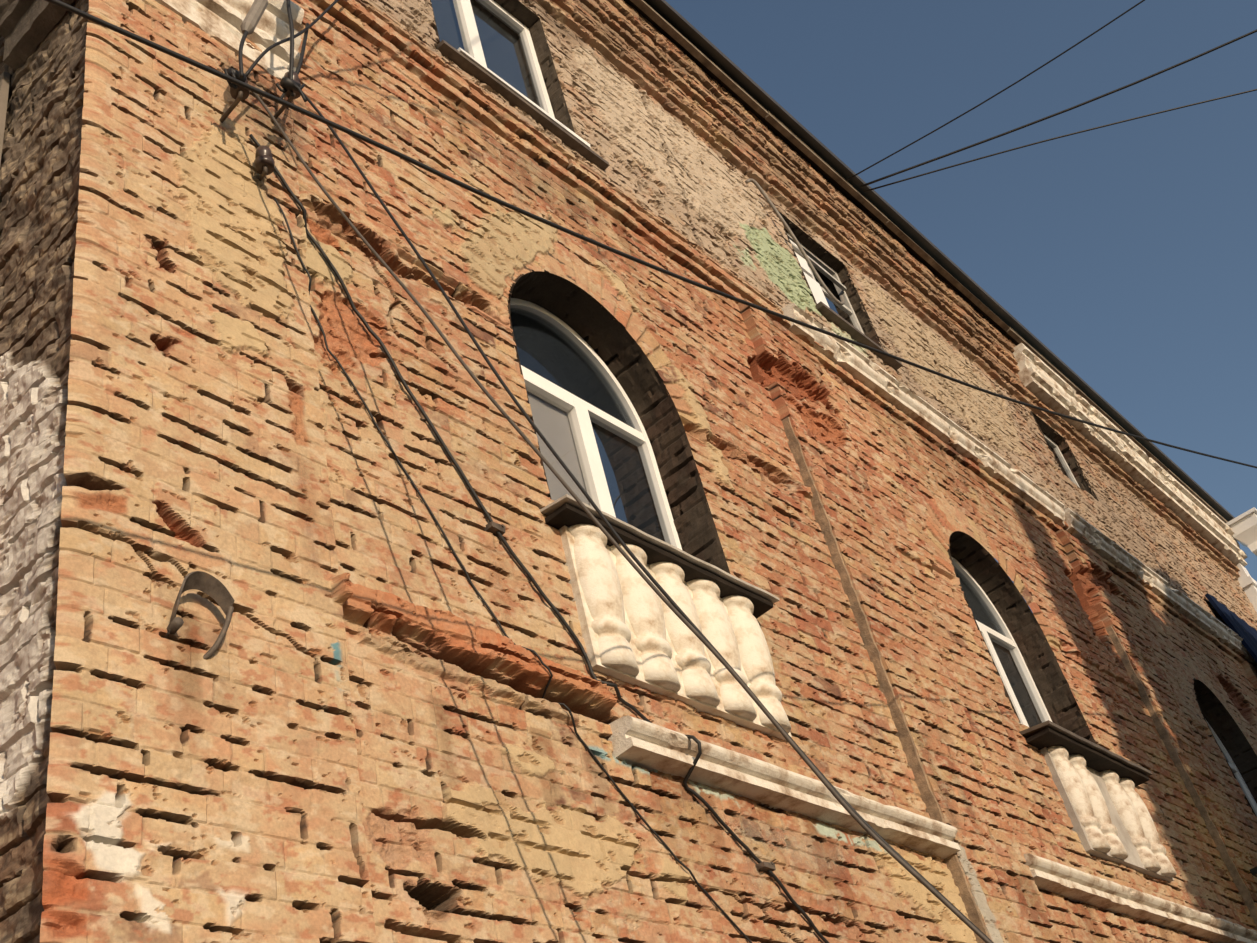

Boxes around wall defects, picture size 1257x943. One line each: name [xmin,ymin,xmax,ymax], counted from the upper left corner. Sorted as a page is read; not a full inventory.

spalling [747,350,848,447]
spalling [1064,562,1138,652]
peeling [40,790,172,940]
peeling [214,834,251,855]
spalling [362,806,462,925]